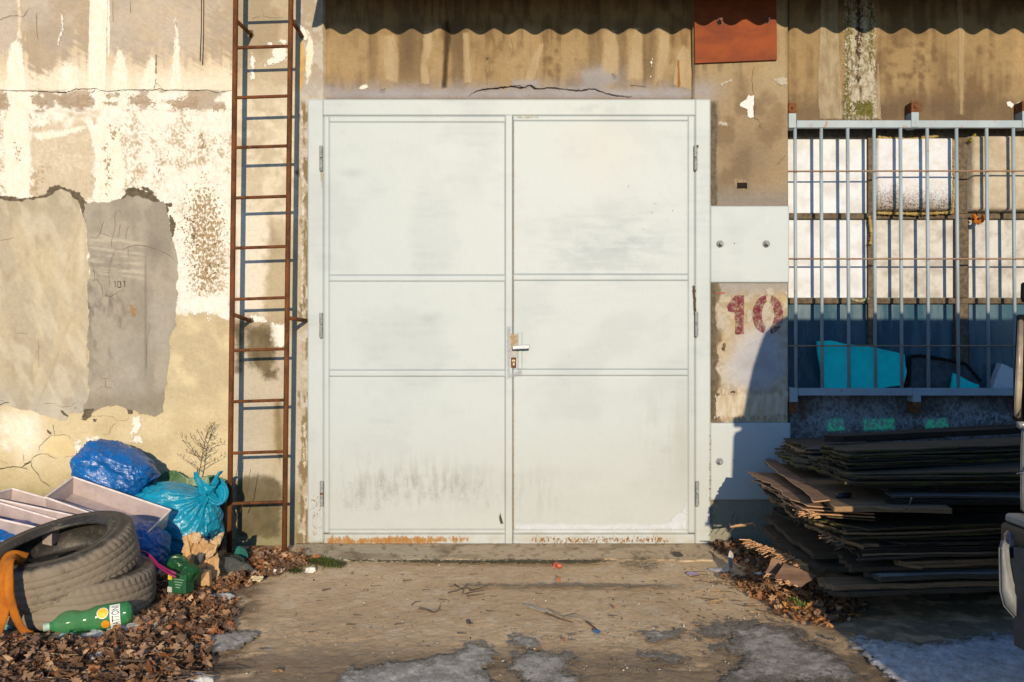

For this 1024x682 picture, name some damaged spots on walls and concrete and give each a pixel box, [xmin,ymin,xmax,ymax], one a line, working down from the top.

damp [818,0,881,120]
damp [3,0,182,201]
crack [468,85,645,98]
peeling [740,95,754,118]
spalling [0,185,87,222]
peeling [745,287,787,324]
peeling [711,284,735,421]
crack [0,434,77,487]
rust [307,493,468,544]
rust [532,535,668,544]